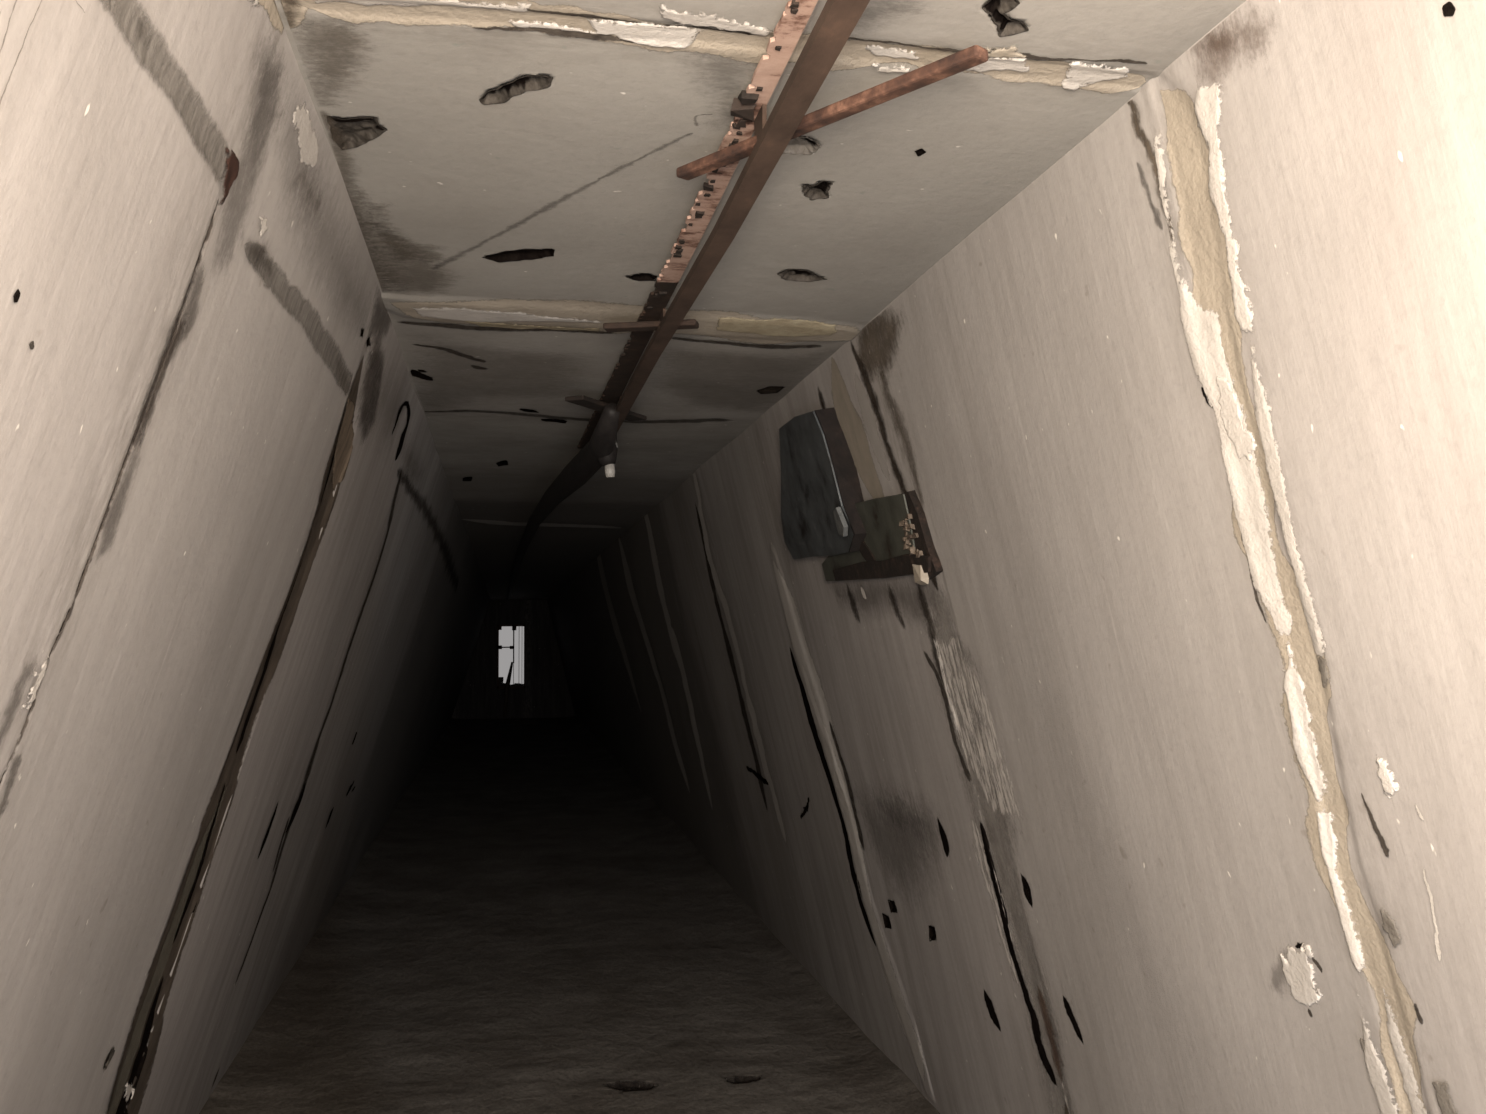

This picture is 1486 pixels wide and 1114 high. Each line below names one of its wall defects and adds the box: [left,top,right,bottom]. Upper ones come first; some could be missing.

peeling [865,45,919,73]
spalling [967,0,1030,72]
peeling [1061,61,1129,91]
crack [0,201,218,814]
peeling [1154,83,1366,973]
crack [173,415,345,943]
crack [236,344,728,982]
peeling [1376,757,1399,798]
peeling [1380,909,1401,947]
crack [132,978,163,1080]
peeling [1280,943,1324,1017]
peeling [1357,989,1457,1114]